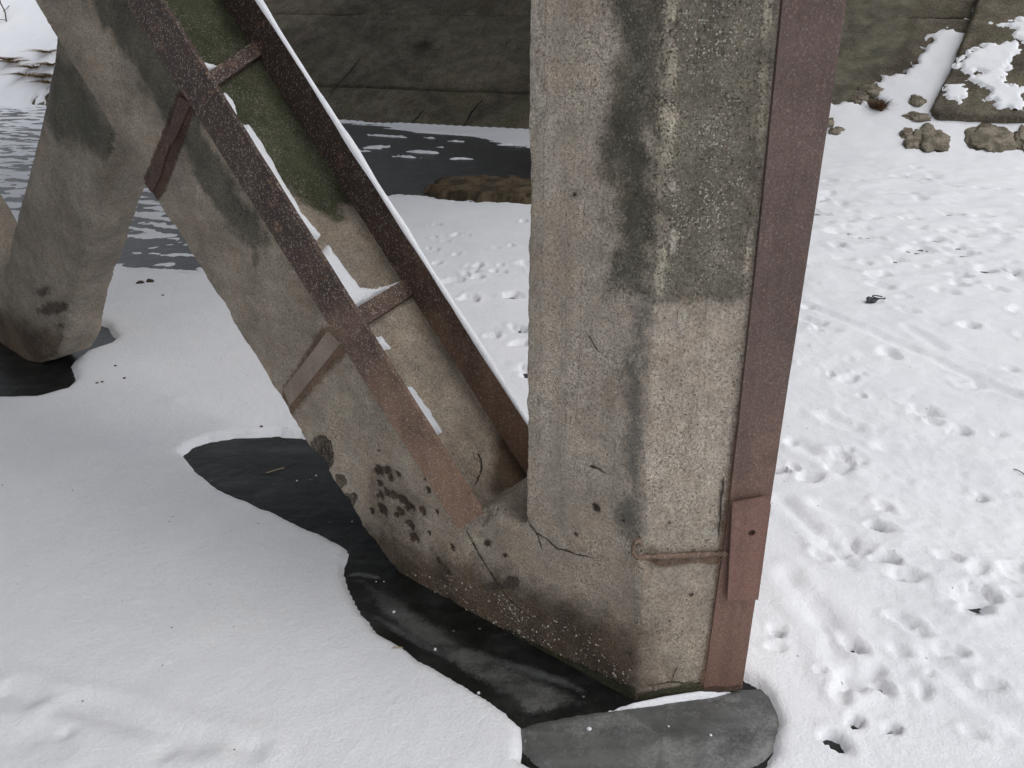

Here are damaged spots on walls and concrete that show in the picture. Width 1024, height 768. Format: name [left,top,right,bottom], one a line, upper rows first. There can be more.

water stain [94,0,181,122]
corrosion [144,92,194,201]
water stain [183,112,266,265]
water stain [600,0,776,480]
corrosion [282,328,346,414]
spalling [370,465,439,543]
crack [467,532,541,623]
water stain [368,530,643,700]
crack [527,519,599,559]
corrosion [644,409,741,693]